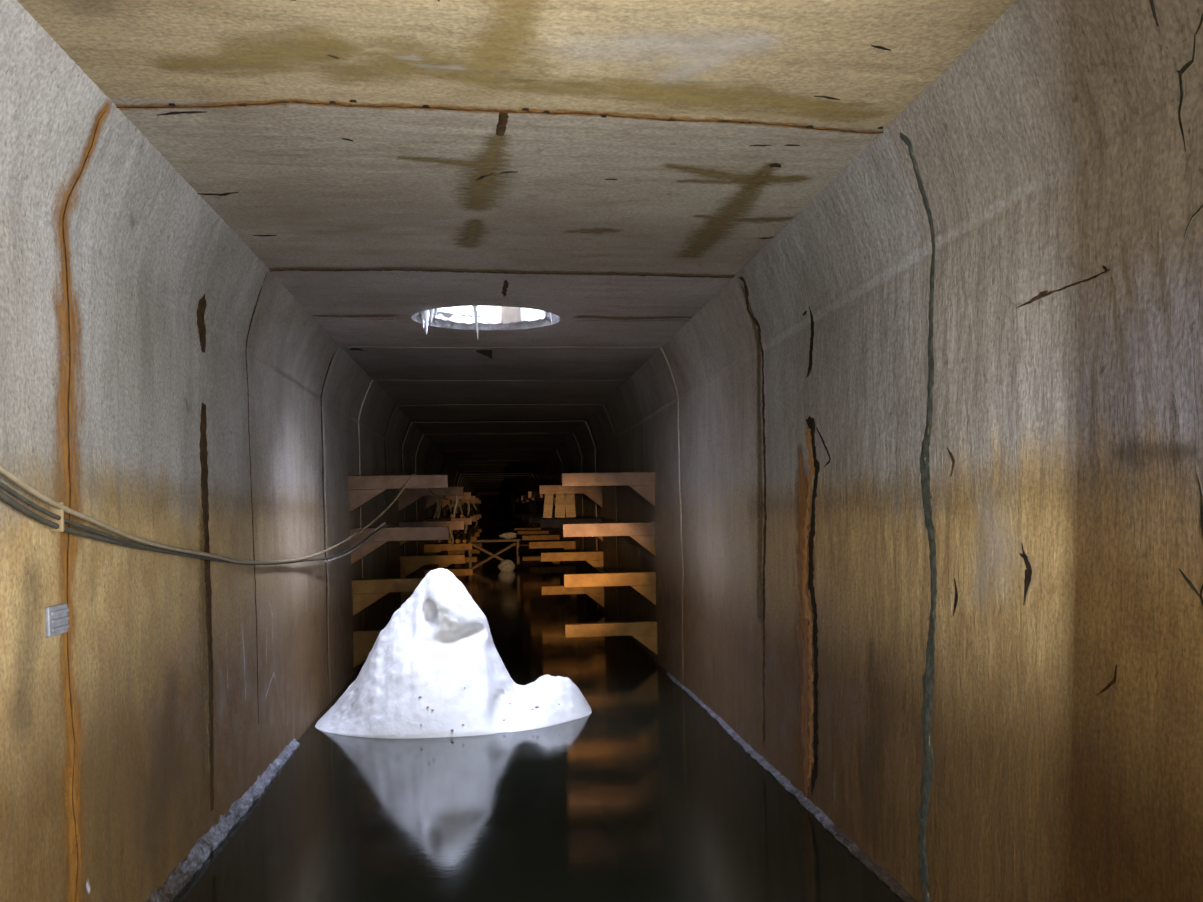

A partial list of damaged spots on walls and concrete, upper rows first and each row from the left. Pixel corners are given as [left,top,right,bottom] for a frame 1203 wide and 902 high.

crack [1149,0,1159,27]
crack [1177,13,1203,151]
crack [1184,205,1203,238]
crack [1016,266,1110,309]
crack [197,294,206,352]
rust [56,100,878,902]
crack [900,132,958,902]
crack [1195,472,1203,537]
crack [199,403,214,812]
crack [1179,569,1203,605]